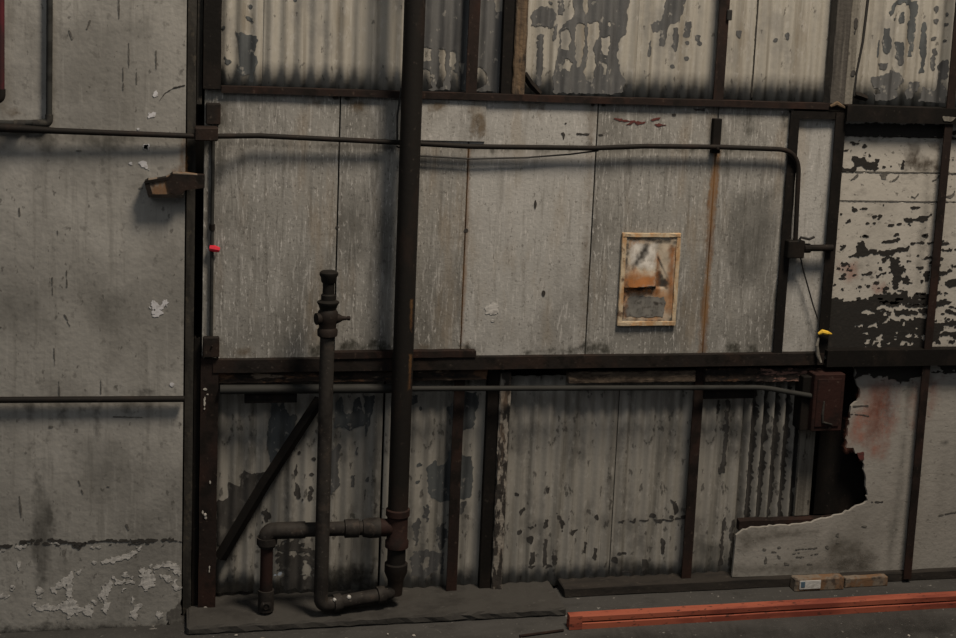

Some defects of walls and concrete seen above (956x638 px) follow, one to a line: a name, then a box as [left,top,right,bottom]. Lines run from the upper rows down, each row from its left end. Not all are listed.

peeling [423,0,502,92]
peeling [530,0,630,107]
peeling [647,0,702,69]
peeling [871,0,949,103]
rust [708,153,719,231]
peeling [842,116,956,181]
peeling [828,191,956,348]
crack [0,537,182,550]
spalling [29,546,182,620]
peeling [275,539,315,592]
peeling [409,444,474,578]
peeling [716,387,799,566]